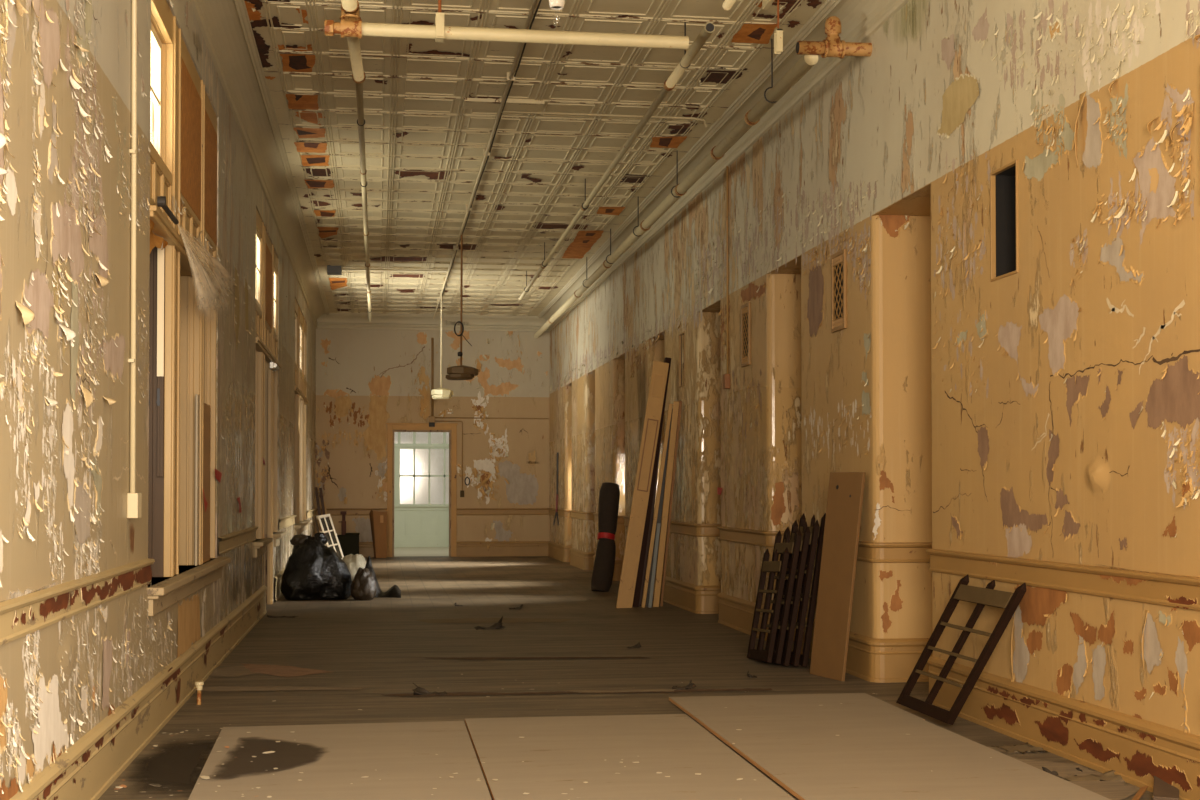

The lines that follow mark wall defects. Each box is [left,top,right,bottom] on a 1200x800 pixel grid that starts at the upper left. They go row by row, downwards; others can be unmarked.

rust [244,0,315,80]
peeling [932,73,1039,398]
peeling [972,0,1200,558]
peeling [0,0,227,800]
peeling [308,337,392,501]
peeling [457,338,539,506]
peeling [802,331,871,460]
crack [945,391,1017,432]
crack [1032,298,1200,450]
peeling [352,516,373,542]
peeling [872,470,895,541]
peeling [981,584,1200,792]